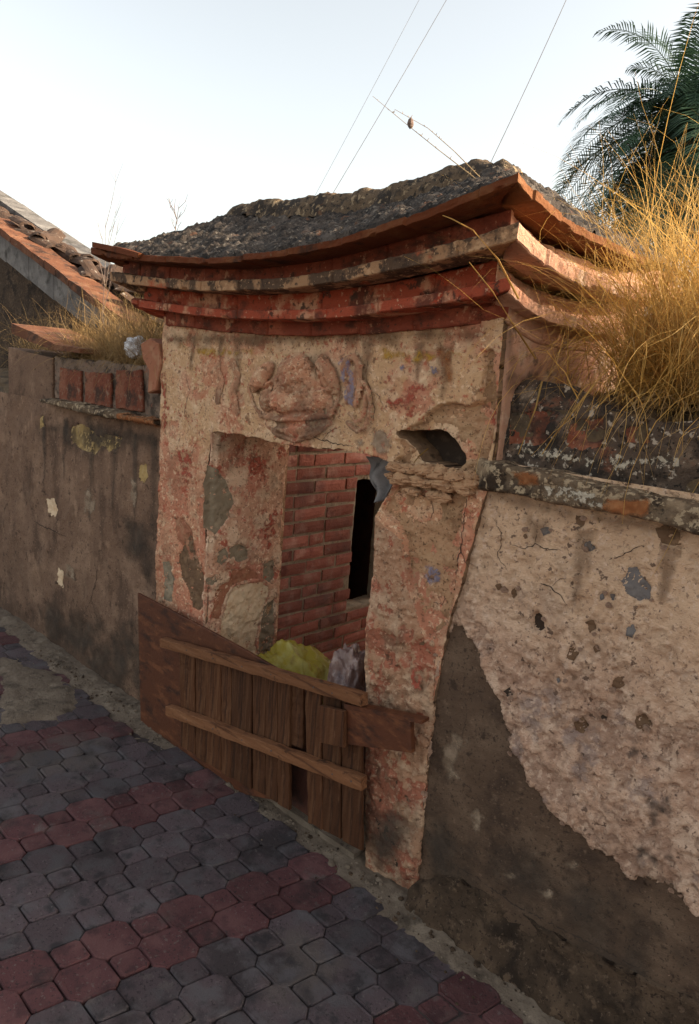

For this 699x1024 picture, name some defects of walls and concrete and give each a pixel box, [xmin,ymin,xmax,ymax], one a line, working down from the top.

damp [43,420,155,484]
flaking render [399,351,498,472]
peeling [162,465,277,655]
crack [497,527,560,570]
peeling [386,485,699,1013]